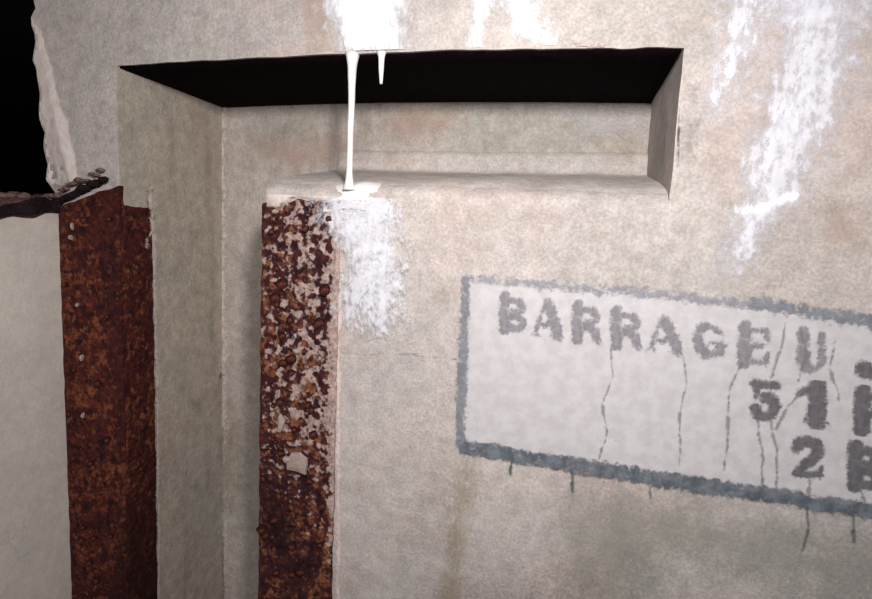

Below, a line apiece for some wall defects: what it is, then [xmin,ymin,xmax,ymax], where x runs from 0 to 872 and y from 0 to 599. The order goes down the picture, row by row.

water stain [313,0,412,51]
efflorescence [467,0,558,48]
efflorescence [705,0,872,275]
efflorescence [316,181,409,337]
rust [269,265,288,307]
rust [319,284,330,296]
rust [278,348,307,377]